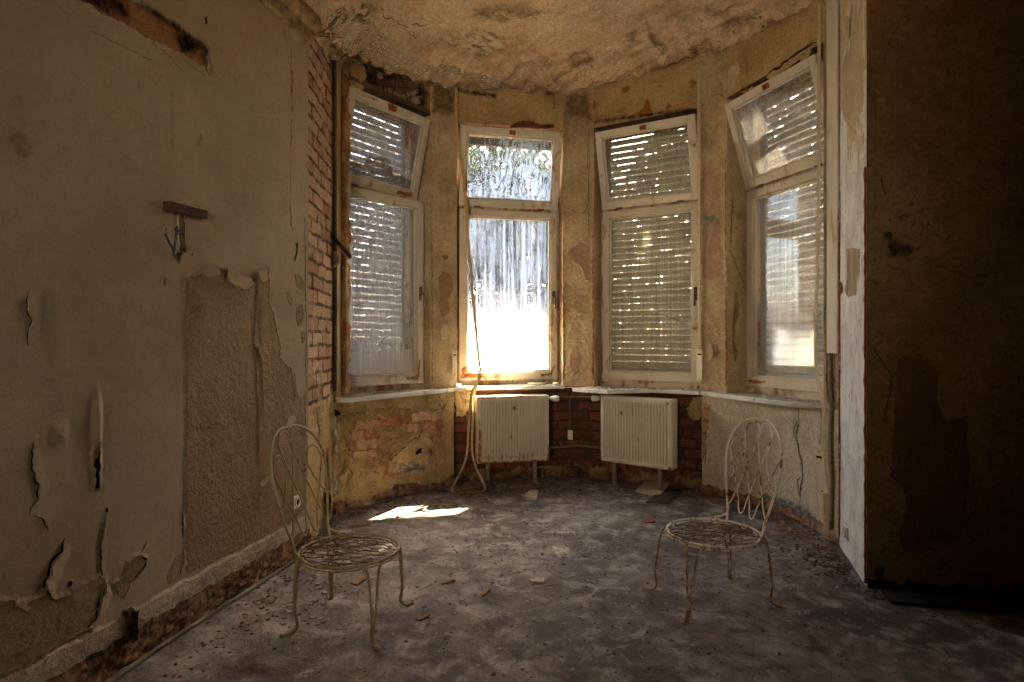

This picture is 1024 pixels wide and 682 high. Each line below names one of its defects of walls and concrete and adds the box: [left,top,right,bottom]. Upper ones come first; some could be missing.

spalling [72,0,211,80]
spalling [343,59,423,107]
peeling [441,29,507,56]
spalling [507,0,797,91]
peeling [166,242,308,584]
flaking render [333,391,443,480]
crack [791,398,857,521]
peeling [0,571,139,678]